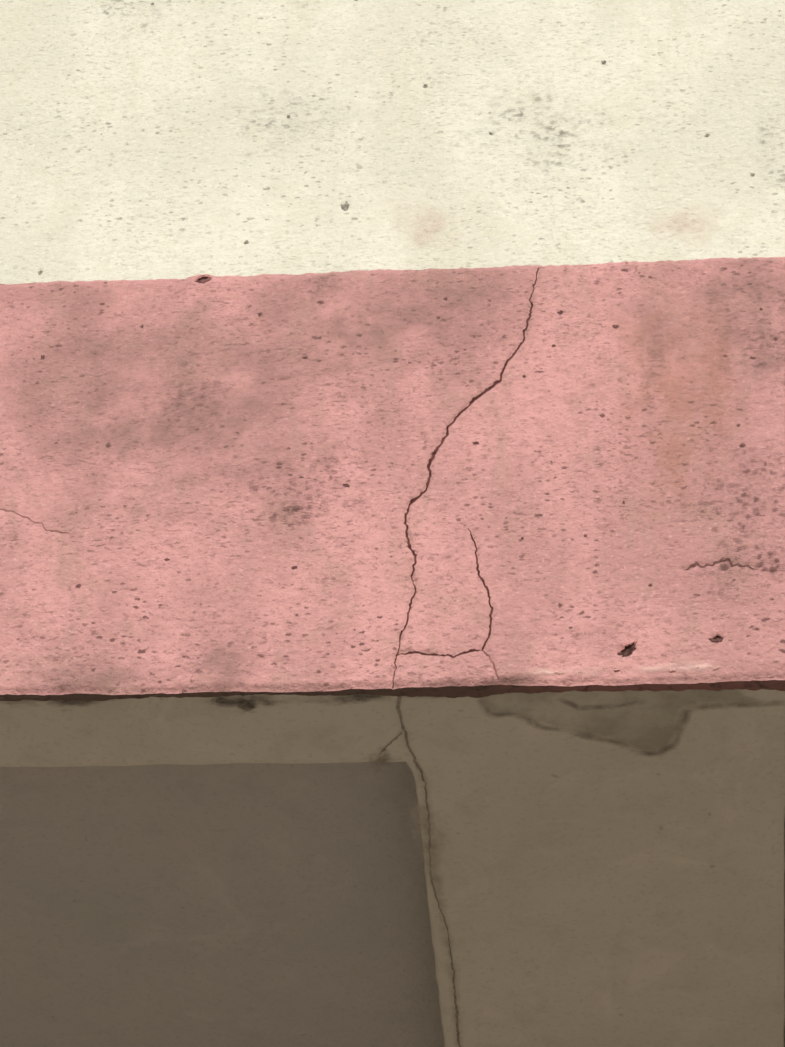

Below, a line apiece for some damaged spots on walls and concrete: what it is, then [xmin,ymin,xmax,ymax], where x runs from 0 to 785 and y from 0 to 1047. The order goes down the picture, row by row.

crack [379,268,539,1047]